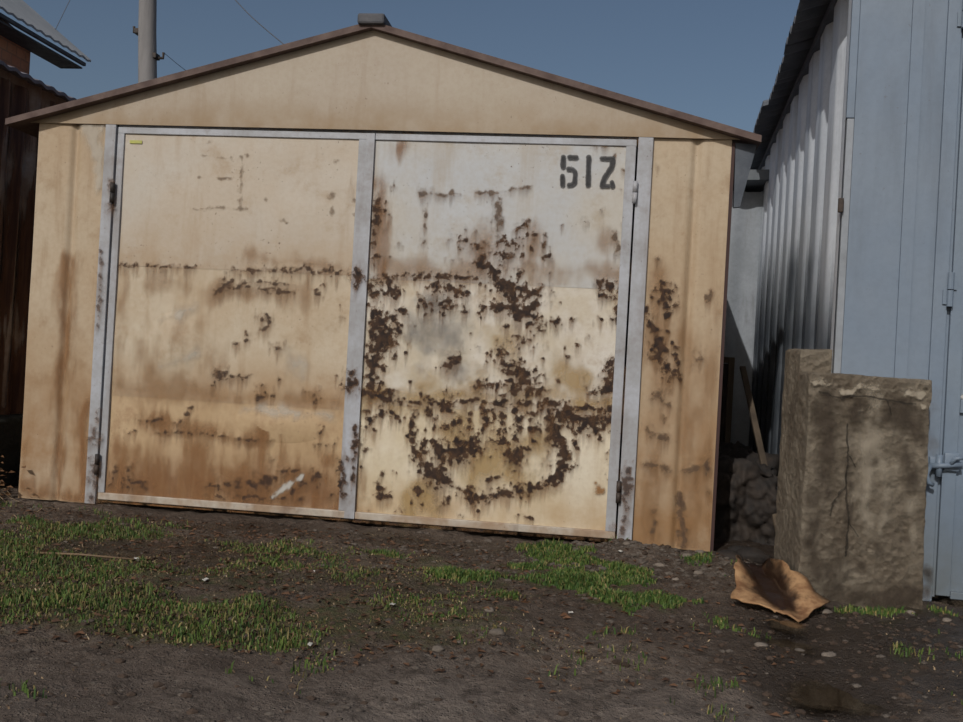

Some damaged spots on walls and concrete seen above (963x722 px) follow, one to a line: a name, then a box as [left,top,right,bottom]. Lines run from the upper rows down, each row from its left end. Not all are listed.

rust [0,77,55,415]
rust [59,255,69,293]
rust [64,184,626,528]
rust [644,280,683,441]
crack [819,391,916,415]
rust [675,491,688,548]
crack [830,424,859,556]